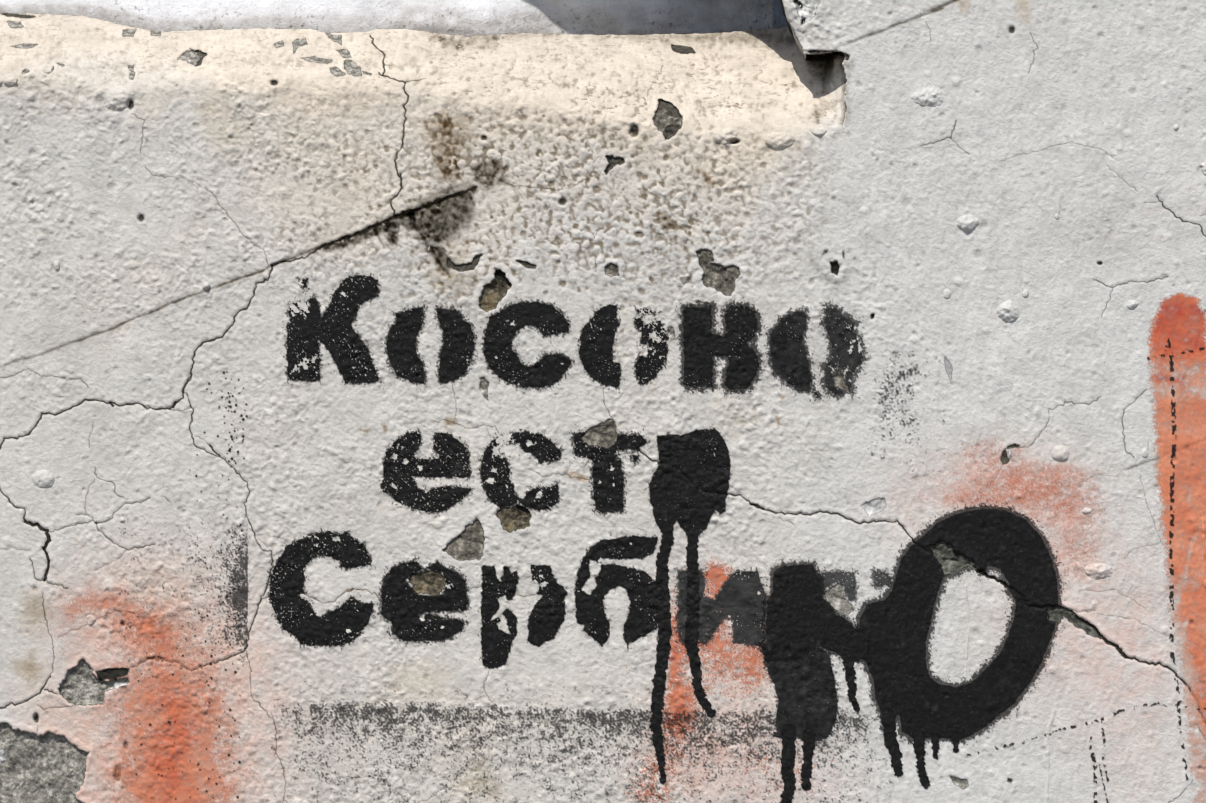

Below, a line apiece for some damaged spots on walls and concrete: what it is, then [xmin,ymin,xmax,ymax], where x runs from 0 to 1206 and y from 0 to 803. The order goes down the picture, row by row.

spalling [653,99,683,140]
spalling [479,270,511,312]
spalling [680,249,740,296]
crack [0,35,477,671]
crack [707,491,913,540]
spalling [442,519,485,561]
crack [975,569,1005,587]
crack [0,677,54,709]
spalling [59,659,129,705]
crack [1070,610,1203,717]
spalling [0,714,88,803]